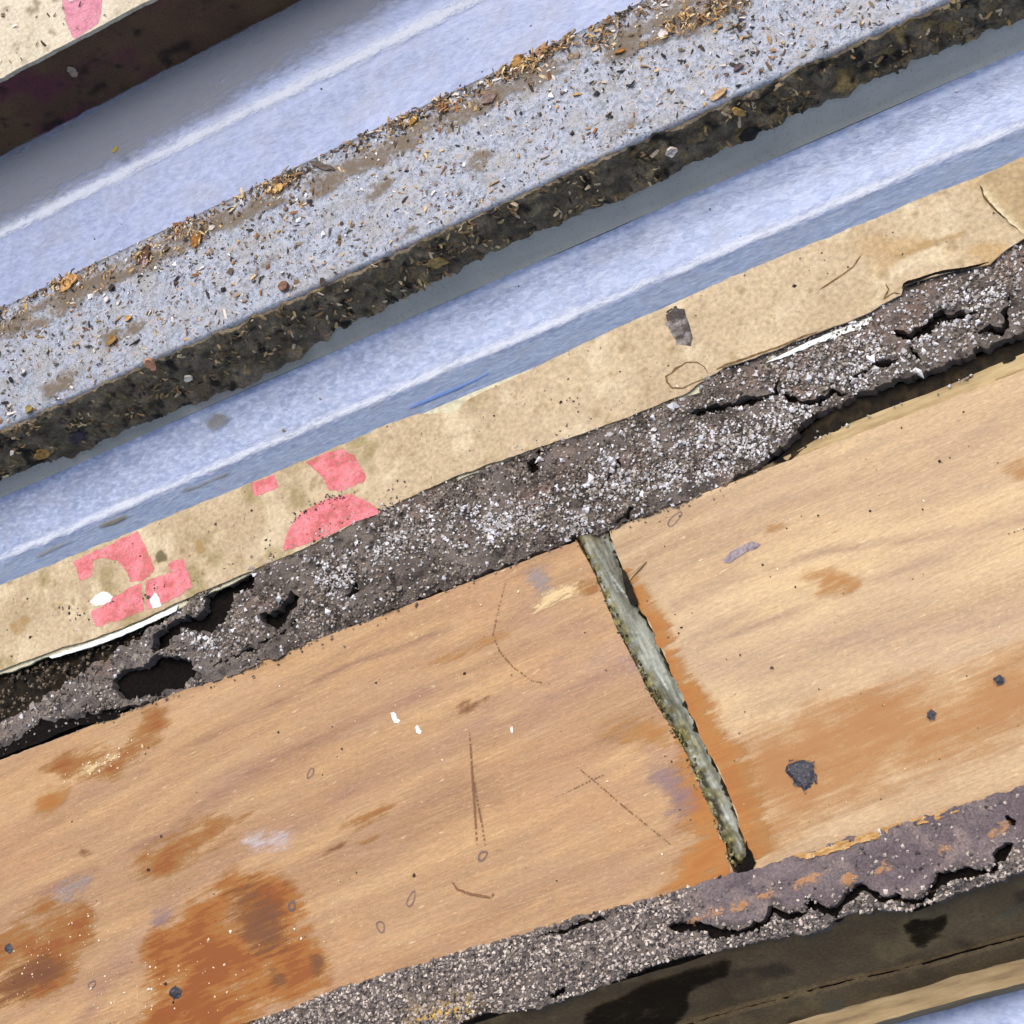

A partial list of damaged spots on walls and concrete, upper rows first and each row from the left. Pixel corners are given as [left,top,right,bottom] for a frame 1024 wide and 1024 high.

crack [819,254,862,290]
crack [896,315,965,362]
crack [987,314,1009,346]
crack [697,388,843,416]
leakage [137,871,330,1024]